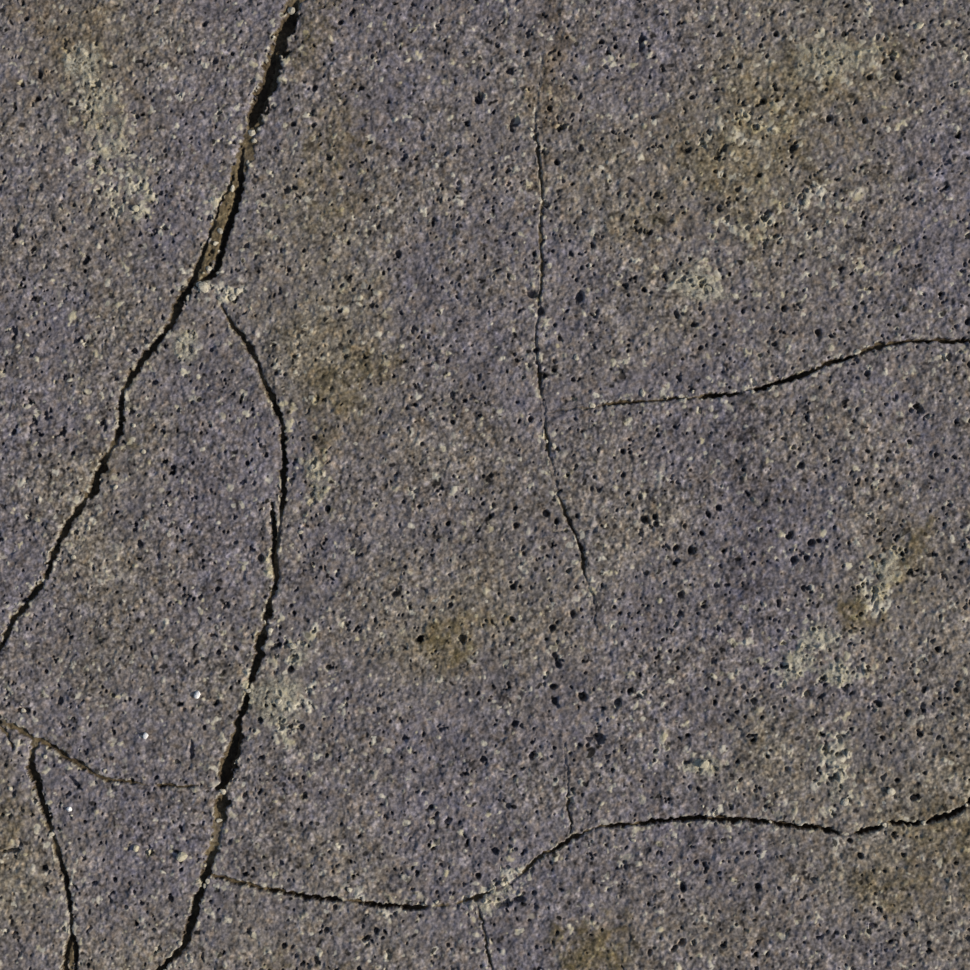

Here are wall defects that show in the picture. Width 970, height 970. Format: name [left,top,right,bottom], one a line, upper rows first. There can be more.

crack [0,0,307,652]
crack [0,288,970,970]
crack [529,39,970,638]